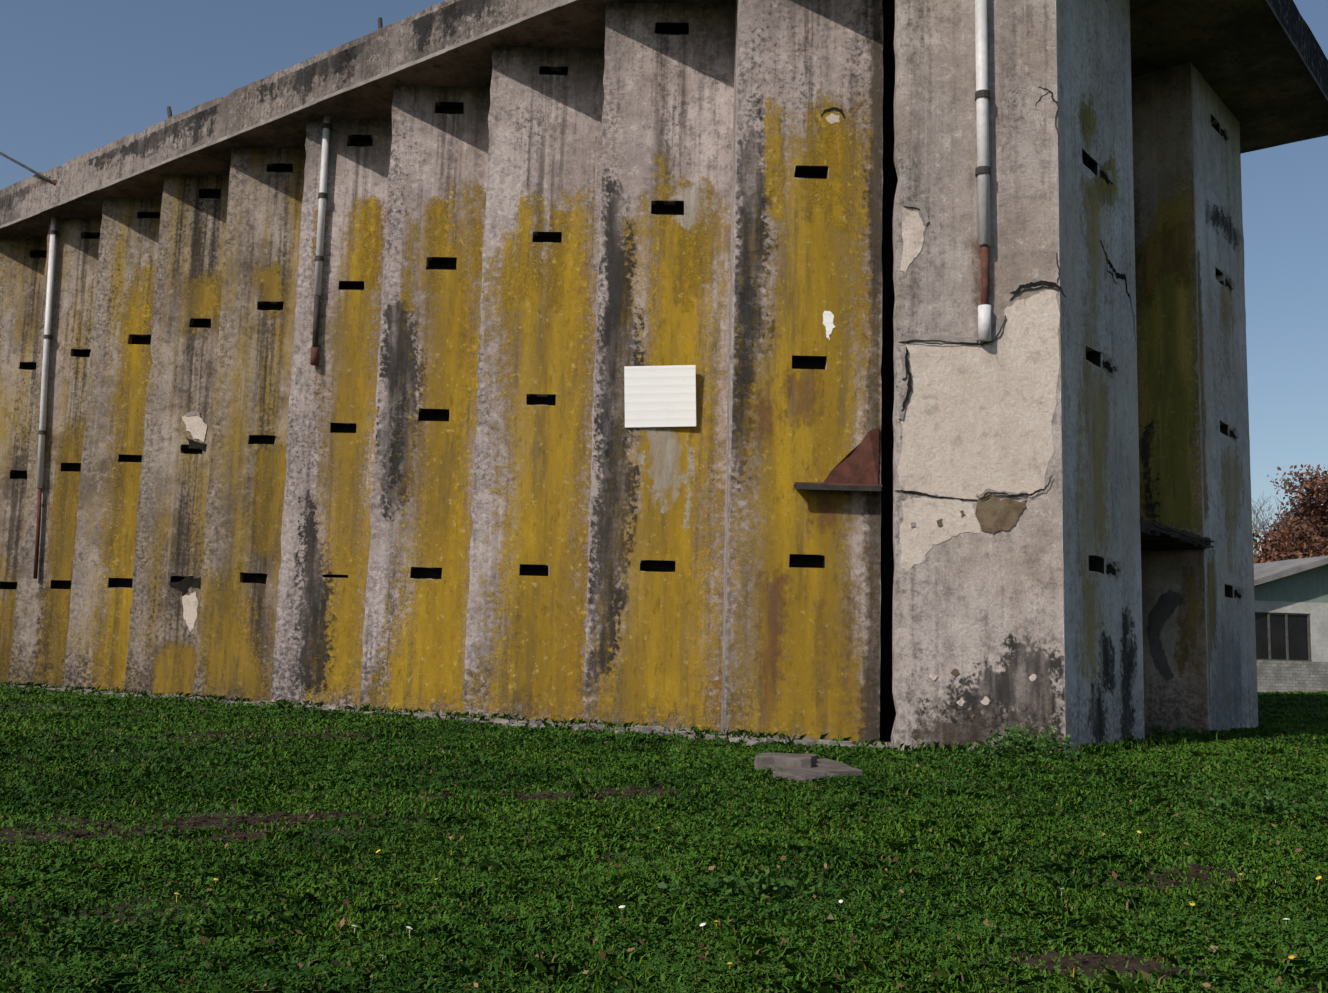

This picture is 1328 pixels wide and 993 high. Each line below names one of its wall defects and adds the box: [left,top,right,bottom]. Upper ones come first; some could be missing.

leakage [731,90,847,489]
leakage [863,0,883,345]
flaking render [901,200,929,274]
crack [898,253,1066,411]
crack [1035,86,1060,146]
crack [1100,240,1136,340]
spalling [182,412,207,451]
leakage [587,169,695,687]
flaking render [897,278,1060,571]
leakage [253,444,336,696]
spalling [956,696,990,719]
leakage [910,633,1065,751]